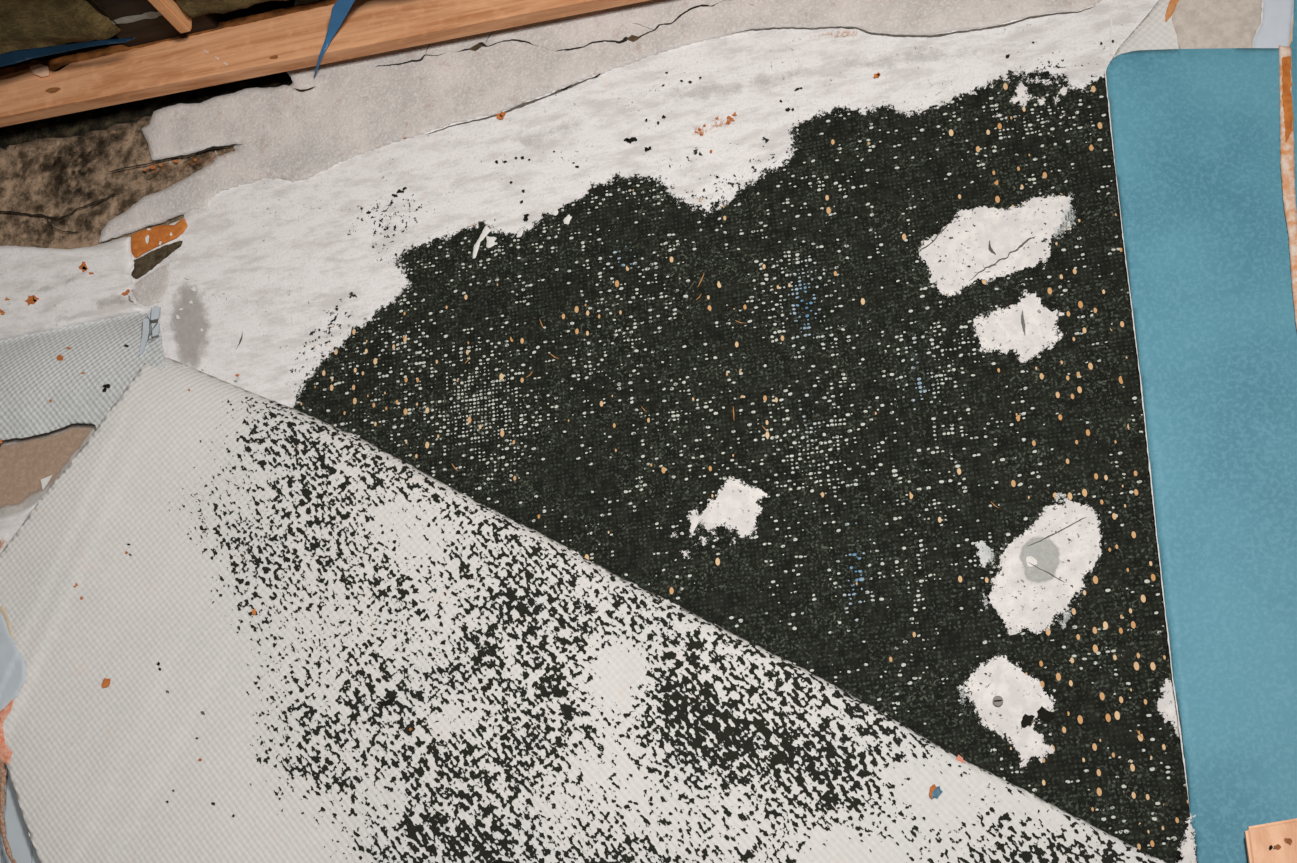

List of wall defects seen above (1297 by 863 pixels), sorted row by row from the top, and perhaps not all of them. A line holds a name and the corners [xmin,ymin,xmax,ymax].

crack [376,0,1092,134]
flaking render [0,475,53,553]
peeling [669,476,768,559]
peeling [974,493,1107,635]
peeling [958,653,1056,769]
peeling [1157,678,1183,740]